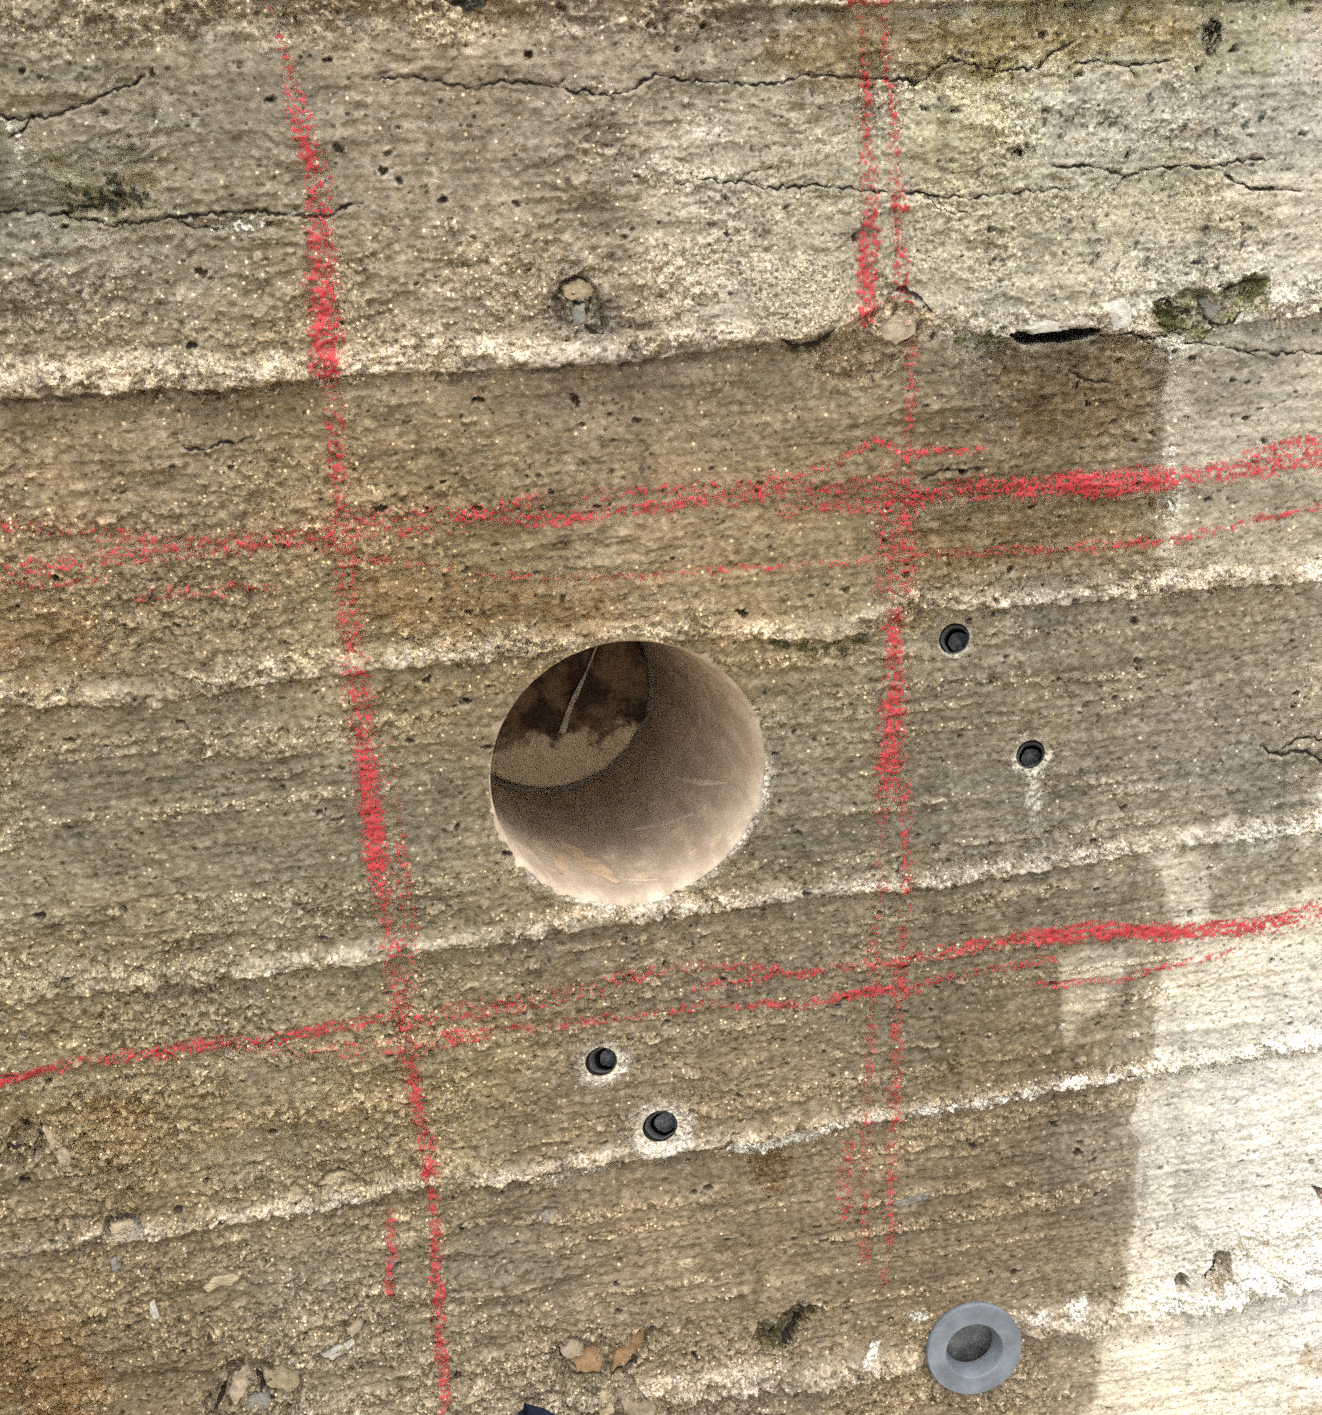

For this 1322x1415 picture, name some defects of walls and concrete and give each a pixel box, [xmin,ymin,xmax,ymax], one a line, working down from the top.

crack [376,41,1170,96]
crack [0,75,145,138]
leakage [211,216,265,231]
spalling [1009,298,1132,344]
spalling [1150,271,1273,344]
crack [1069,328,1322,391]
leakage [1162,420,1183,582]
leakage [912,1047,1322,1117]
leakage [715,1122,845,1154]
spalling [1174,1251,1234,1297]
leakage [1034,1295,1088,1327]
leakage [863,1340,880,1372]